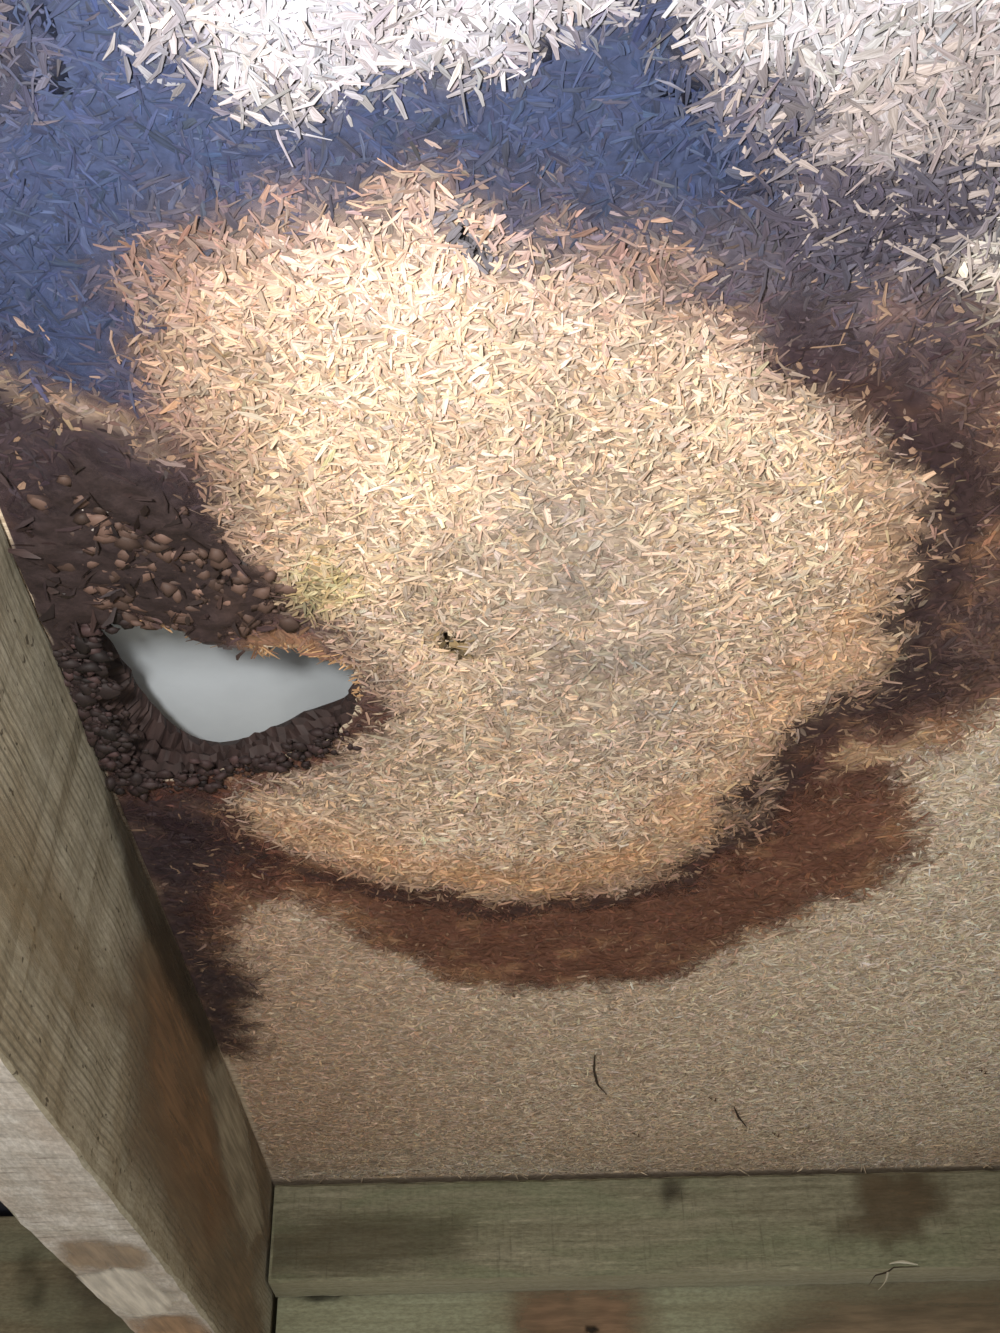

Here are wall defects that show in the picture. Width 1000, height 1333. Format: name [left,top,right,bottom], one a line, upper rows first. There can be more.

damp [487,20,528,49]
damp [461,56,495,84]
damp [771,130,806,155]
damp [789,181,811,210]
damp [227,593,360,668]
spalling [433,630,477,666]
damp [465,484,721,770]
damp [281,668,397,780]
peeling [219,698,1000,1180]
damp [858,1173,937,1232]